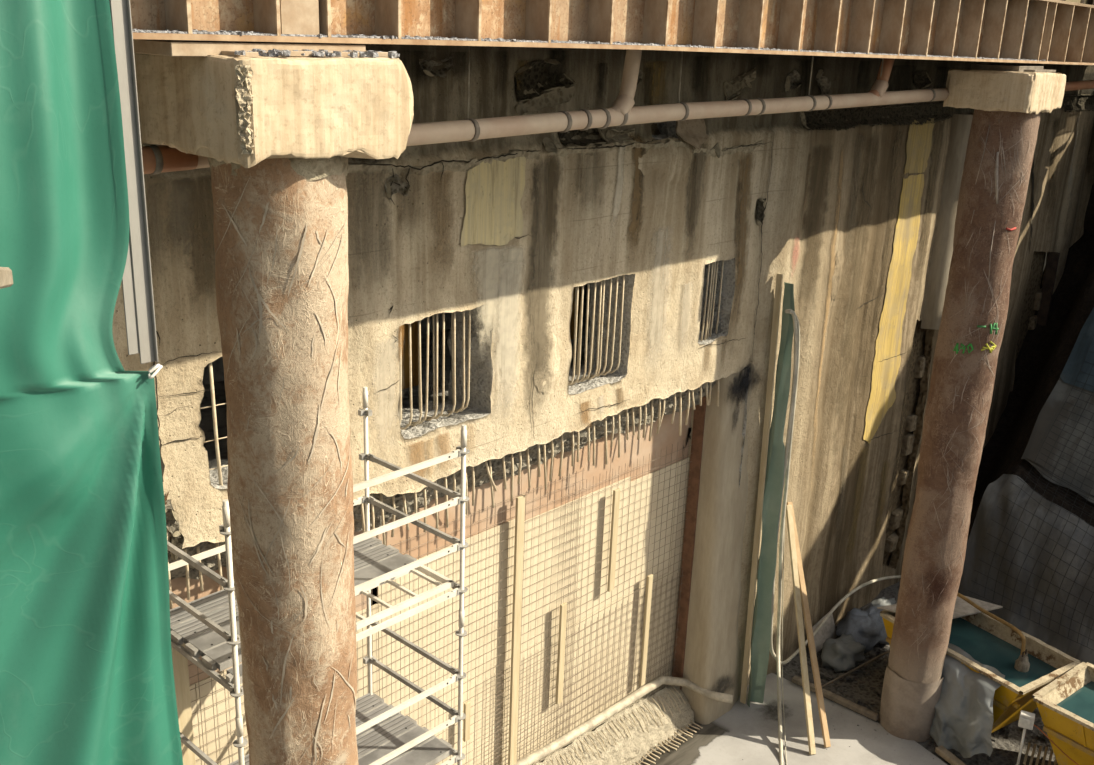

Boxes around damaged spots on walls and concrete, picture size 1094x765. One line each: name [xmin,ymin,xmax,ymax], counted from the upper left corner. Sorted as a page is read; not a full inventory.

spalling [235,65,256,154]
crack [352,139,658,205]
spalling [515,58,577,115]
spalling [913,70,933,89]
damp [919,121,943,267]
damp [476,156,561,396]
damp [805,147,843,425]
peeling [800,102,952,444]
crack [153,331,222,505]
spalling [353,380,717,532]
damp [730,363,759,425]
spalling [165,499,233,580]